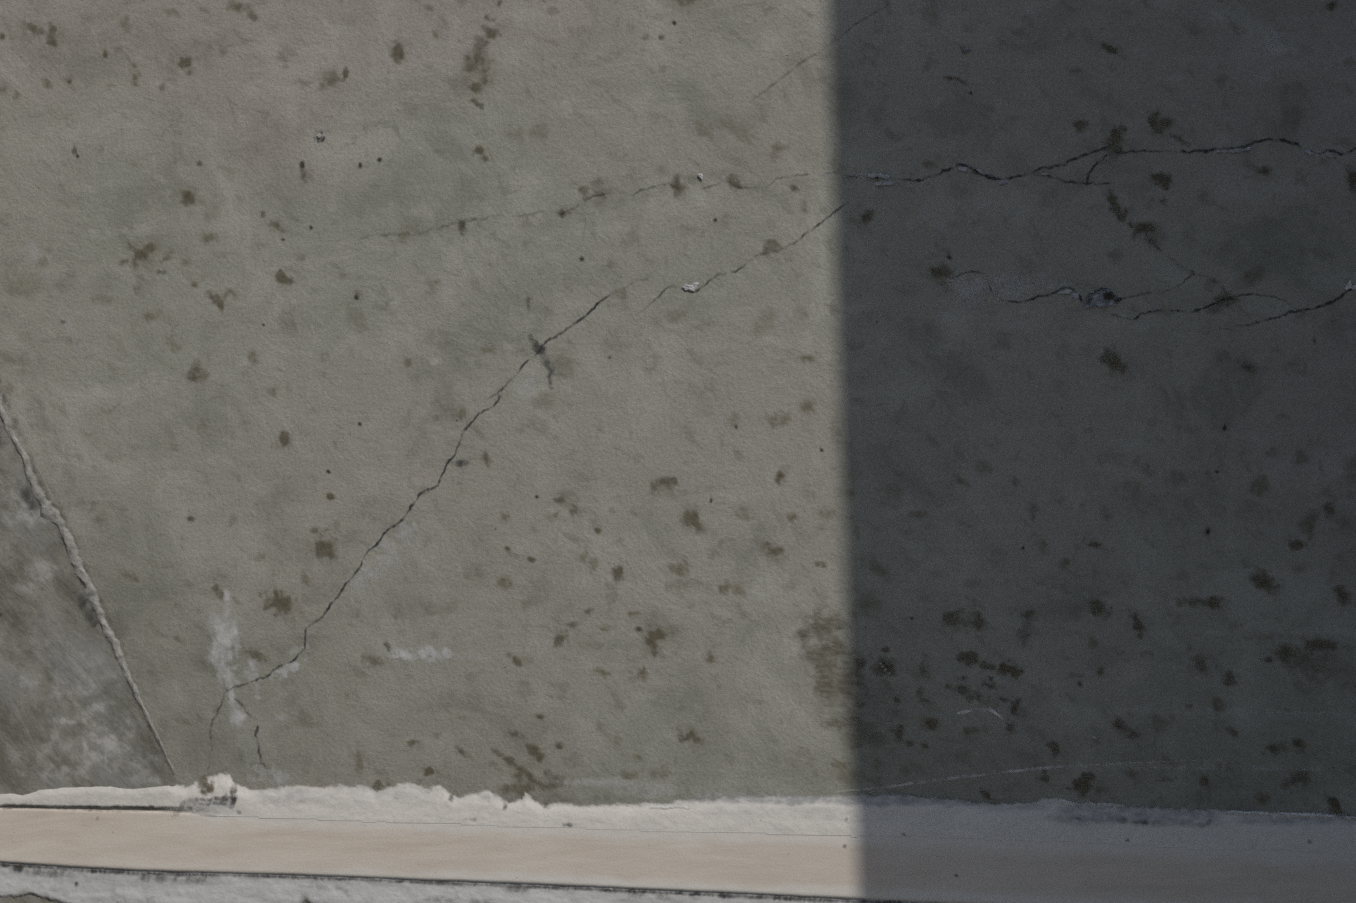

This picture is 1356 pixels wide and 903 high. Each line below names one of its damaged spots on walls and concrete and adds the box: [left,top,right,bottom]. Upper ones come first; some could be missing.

crack [868,138,1356,186]
crack [659,267,742,296]
crack [971,271,1356,326]
crack [237,296,608,686]
peeling [0,893,62,903]